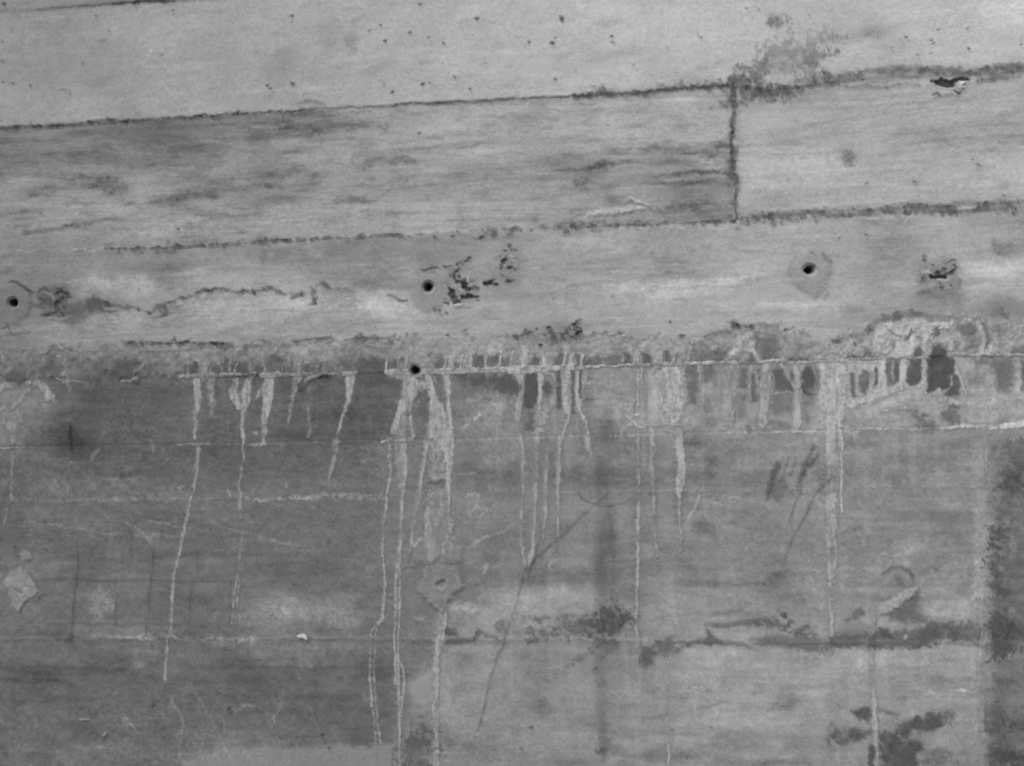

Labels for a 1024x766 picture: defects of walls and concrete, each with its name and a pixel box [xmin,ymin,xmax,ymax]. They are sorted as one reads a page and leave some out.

spalling [931,78,968,96]
spalling [422,244,516,314]
spalling [921,256,957,291]
damp [163,319,1024,766]